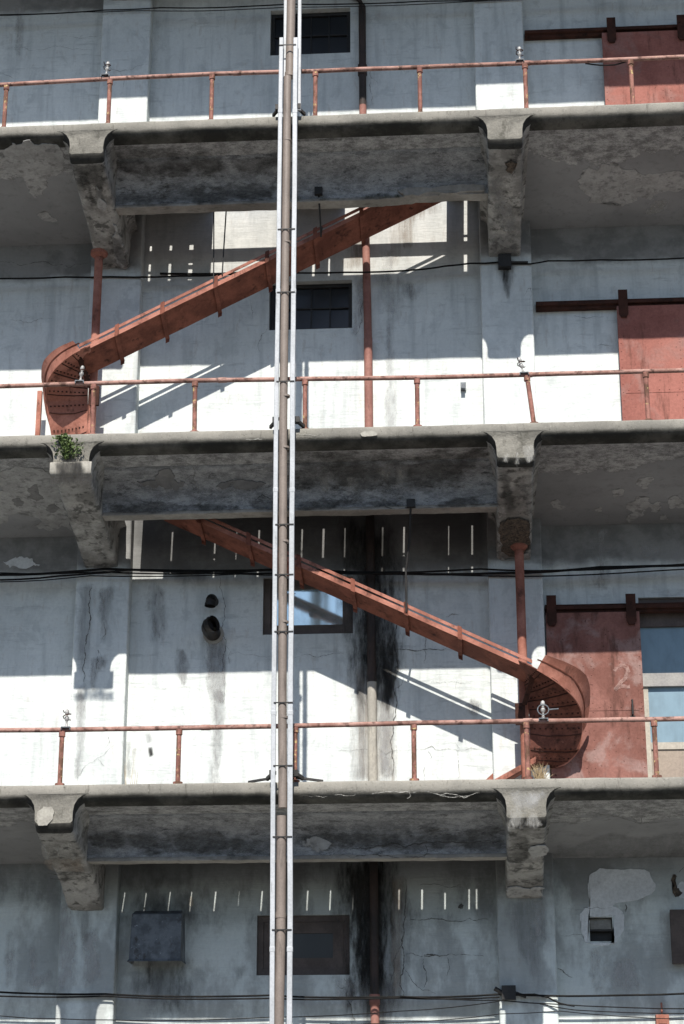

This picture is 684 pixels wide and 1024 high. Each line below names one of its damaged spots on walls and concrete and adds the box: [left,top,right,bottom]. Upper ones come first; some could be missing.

peeling [0,140,65,198]
peeling [577,161,684,206]
spalling [498,518,530,561]
peeling [4,556,39,569]
crack [82,588,106,679]
spalling [516,841,549,865]
water stain [352,866,383,990]
crack [391,884,482,996]
peeling [590,914,624,946]